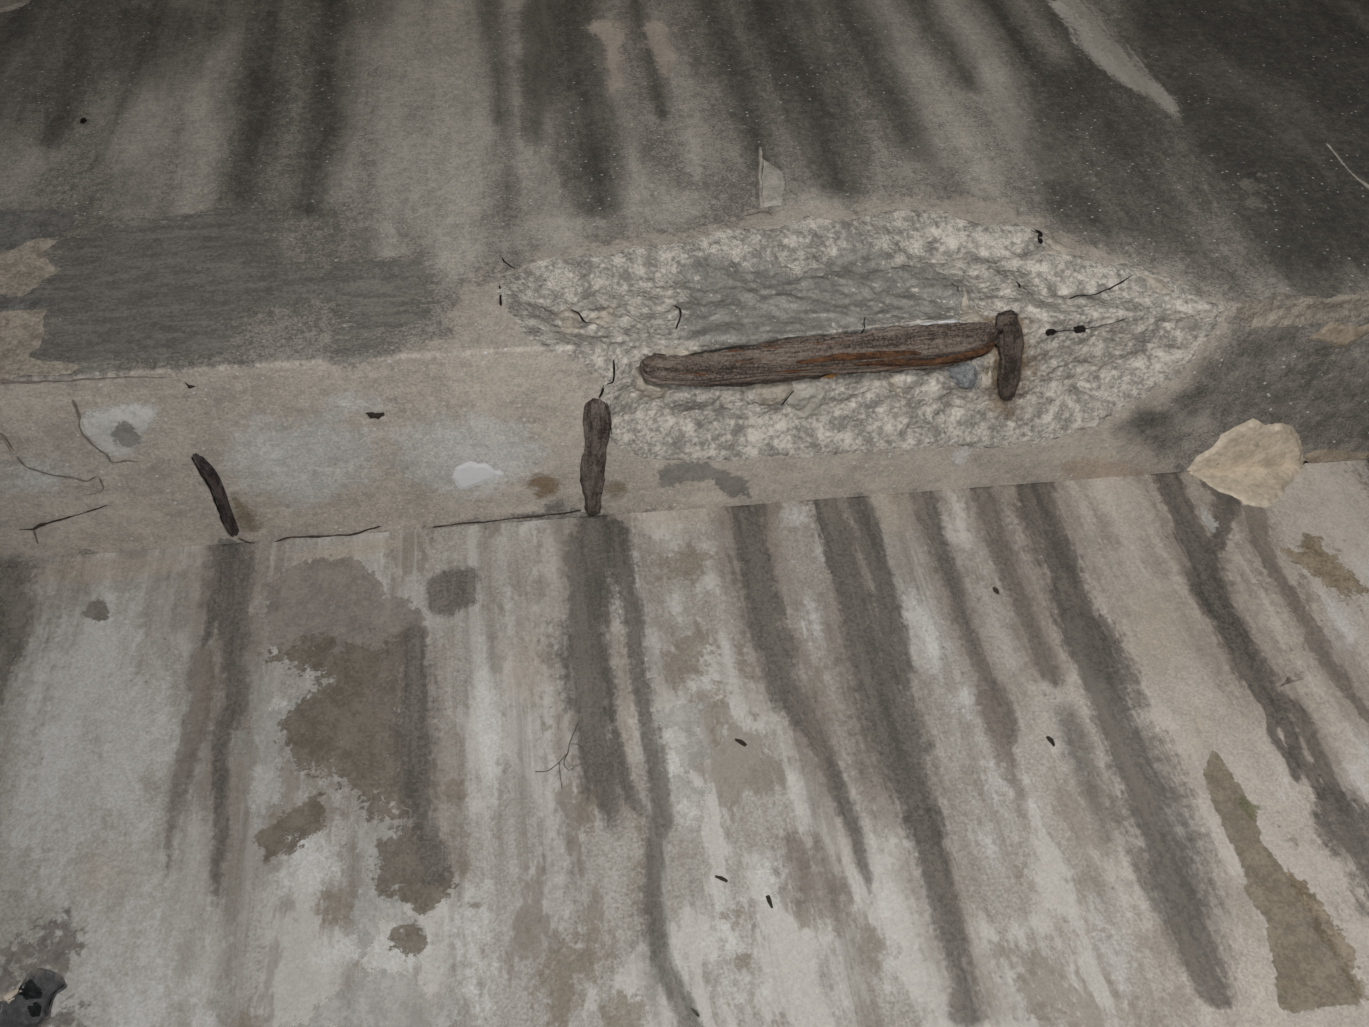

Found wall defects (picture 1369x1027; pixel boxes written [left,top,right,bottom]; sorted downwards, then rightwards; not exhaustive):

crack [0,376,165,463]
leakage [0,198,440,375]
peeling [762,159,785,207]
spalling [495,208,1369,463]
leakage [1048,0,1179,114]
leakage [168,542,478,1027]
leakage [559,514,711,1027]
leakage [658,462,871,883]
leakage [813,496,977,1025]
leakage [911,491,1016,787]
leakage [970,472,1369,1013]
peeling [0,987,19,1004]